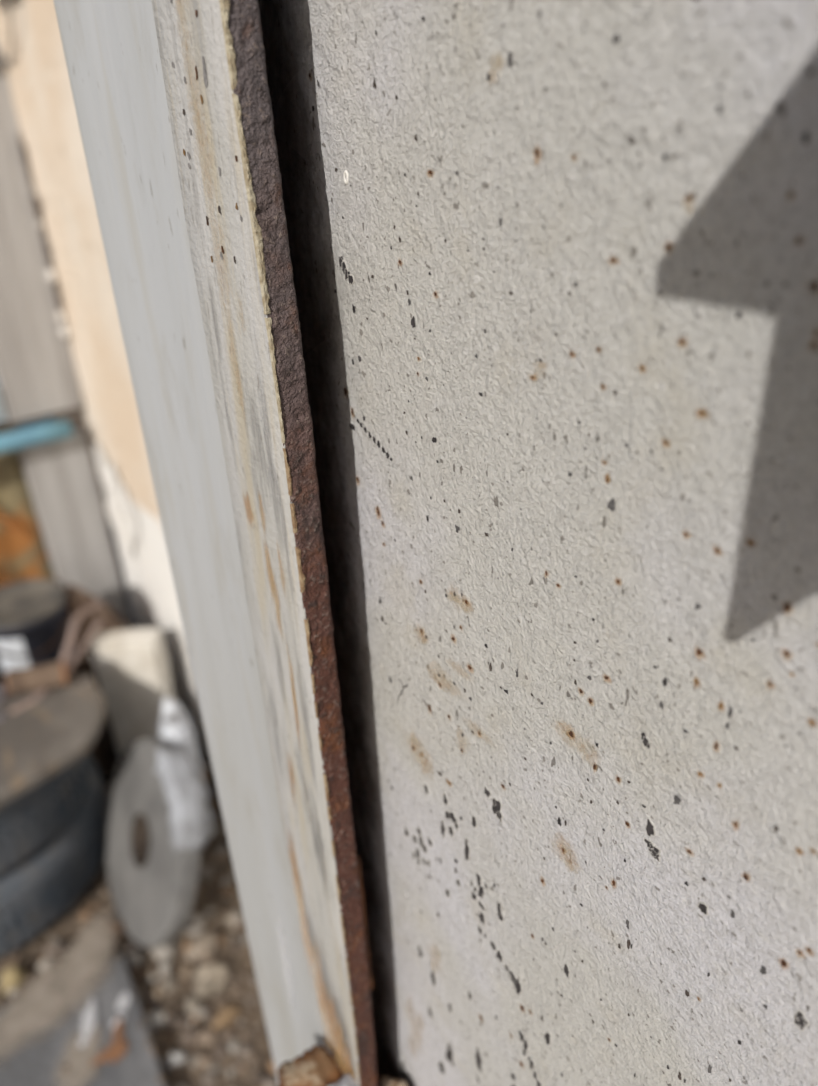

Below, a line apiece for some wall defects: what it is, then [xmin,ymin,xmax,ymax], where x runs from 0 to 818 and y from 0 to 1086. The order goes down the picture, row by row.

corrosion [262,0,379,918]
corrosion [368,932,395,1081]